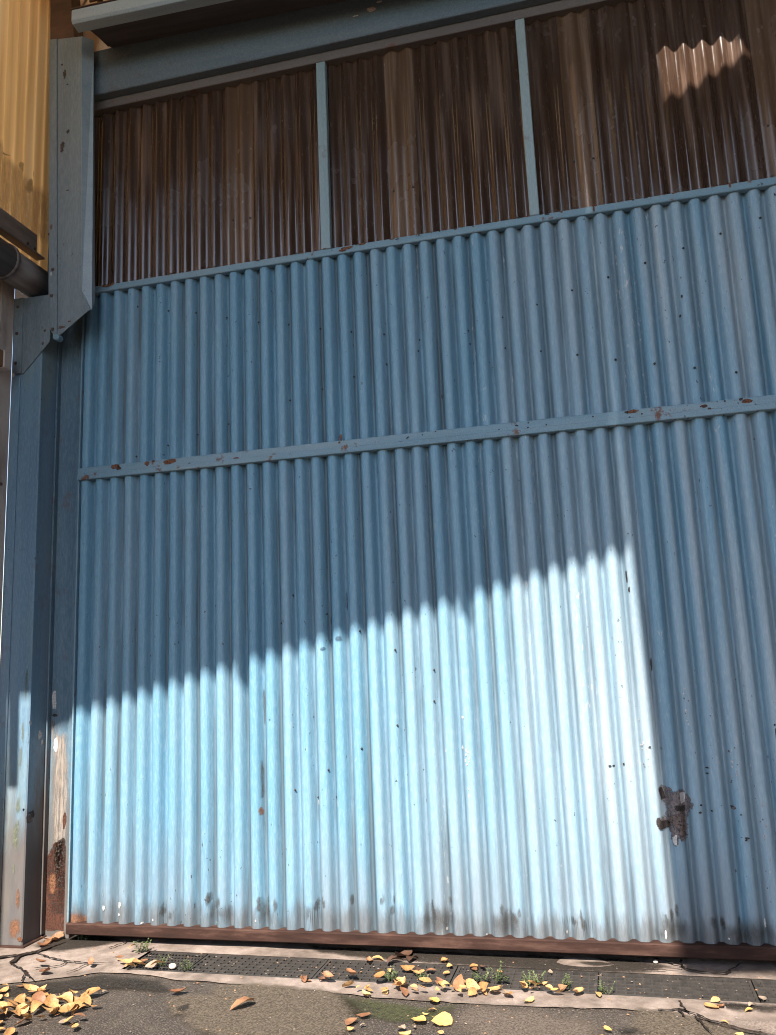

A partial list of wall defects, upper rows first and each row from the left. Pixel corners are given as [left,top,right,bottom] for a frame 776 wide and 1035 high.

corrosion [45,813,87,931]
peeling [656,785,713,846]